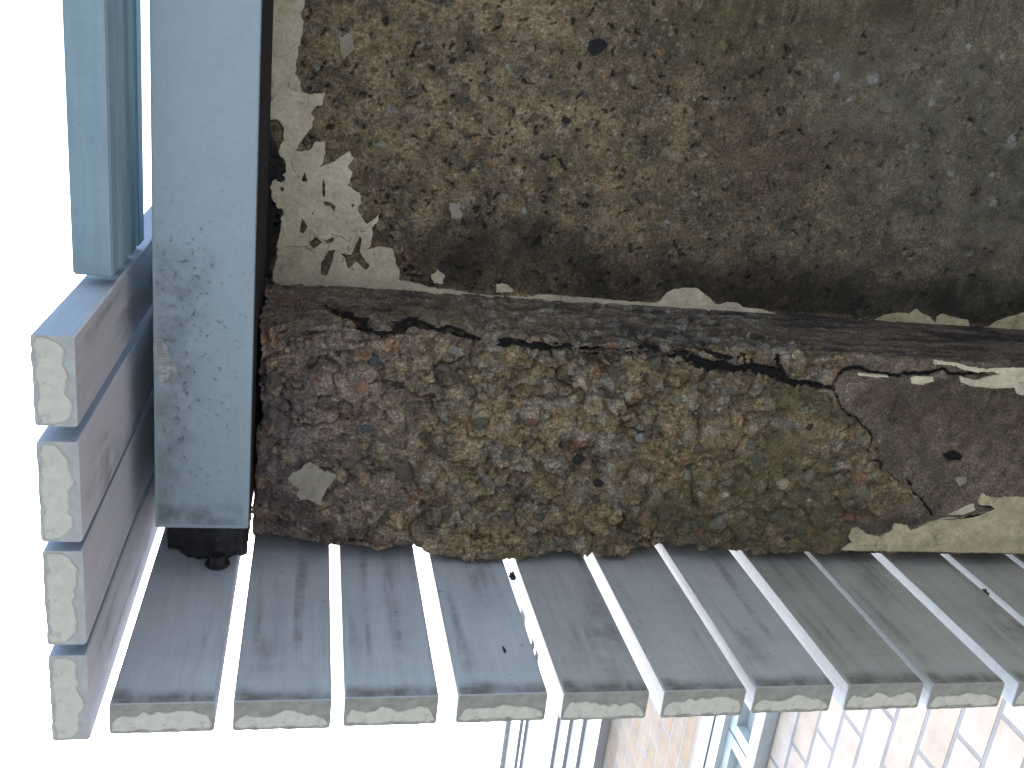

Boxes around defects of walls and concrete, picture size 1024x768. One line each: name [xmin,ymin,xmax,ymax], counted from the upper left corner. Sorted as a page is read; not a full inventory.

spalling [251,0,1024,562]
crack [322,302,984,469]
crack [906,478,995,520]